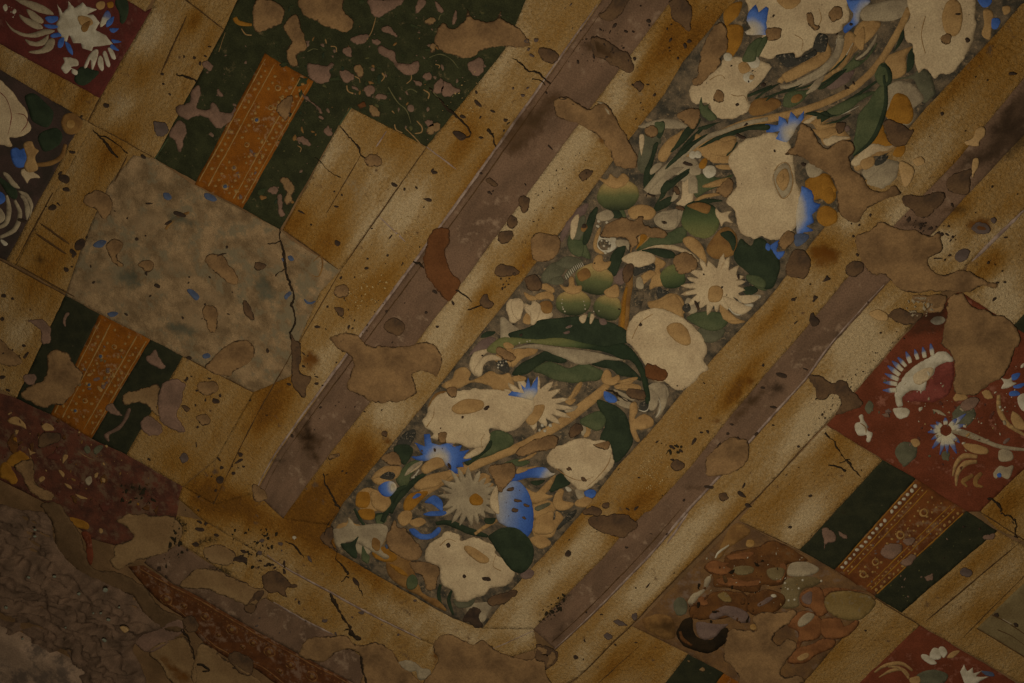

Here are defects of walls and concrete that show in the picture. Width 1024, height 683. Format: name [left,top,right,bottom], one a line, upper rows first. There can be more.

spalling [545,92,638,169]
crack [268,228,296,339]
spalling [287,254,442,412]
spalling [411,227,461,305]
spalling [774,119,1021,419]
crack [824,432,860,476]
spalling [0,459,261,683]
spalling [179,528,300,627]
crack [323,473,367,683]